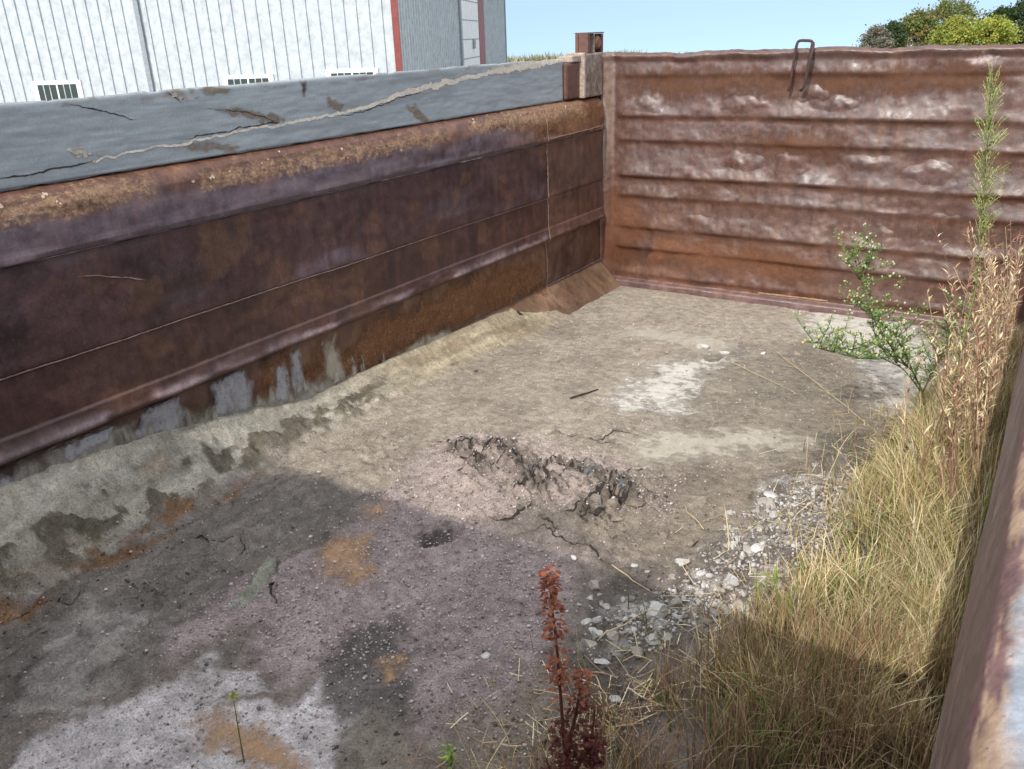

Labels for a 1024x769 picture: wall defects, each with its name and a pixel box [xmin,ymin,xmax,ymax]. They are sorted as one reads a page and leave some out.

crack [0,59,563,179]
rust [535,104,604,140]
rust [634,66,795,100]
rust [753,128,846,162]
rust [812,61,1005,98]
rust [605,192,818,276]
rust [258,265,544,401]
crack [437,430,642,561]